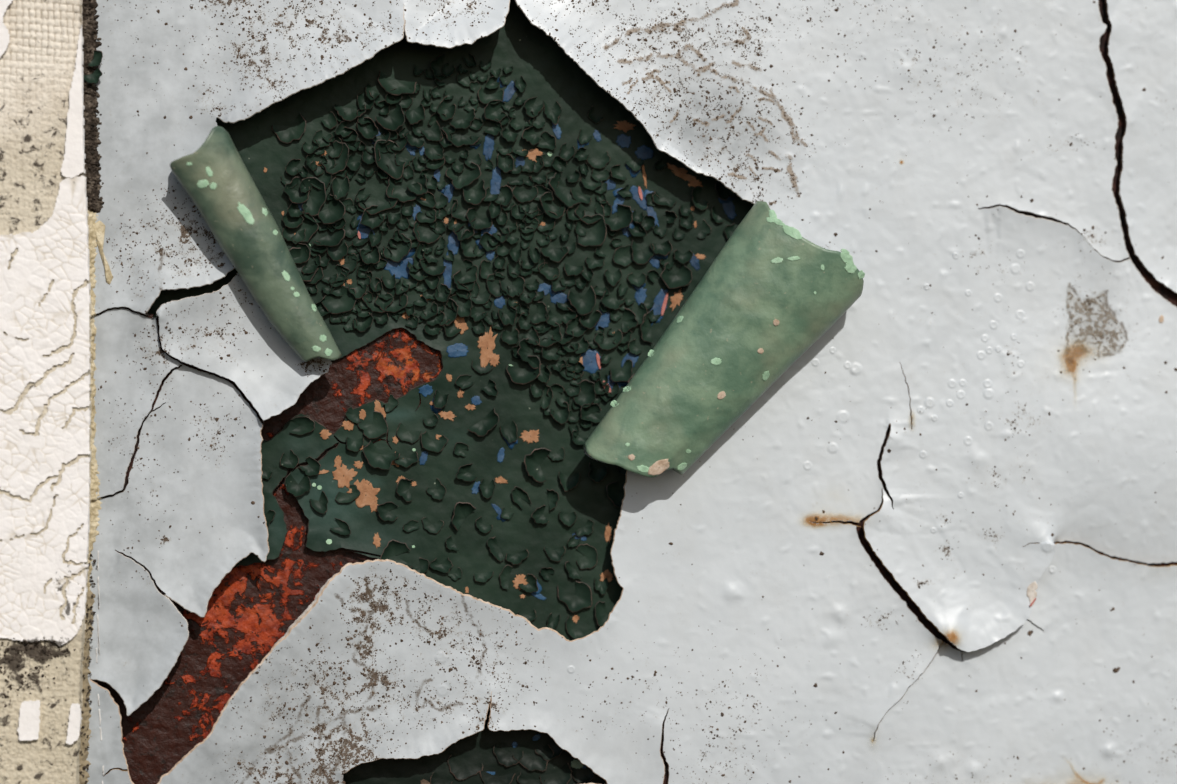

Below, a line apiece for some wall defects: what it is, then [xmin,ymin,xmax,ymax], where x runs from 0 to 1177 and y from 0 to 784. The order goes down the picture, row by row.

crack [0,26,266,646]
corrosion [92,328,443,784]
peeling [88,0,865,784]
corrosion [805,515,850,526]
crack [810,363,966,741]
crack [978,0,1177,307]
crack [1022,540,1177,567]
crack [660,709,669,784]